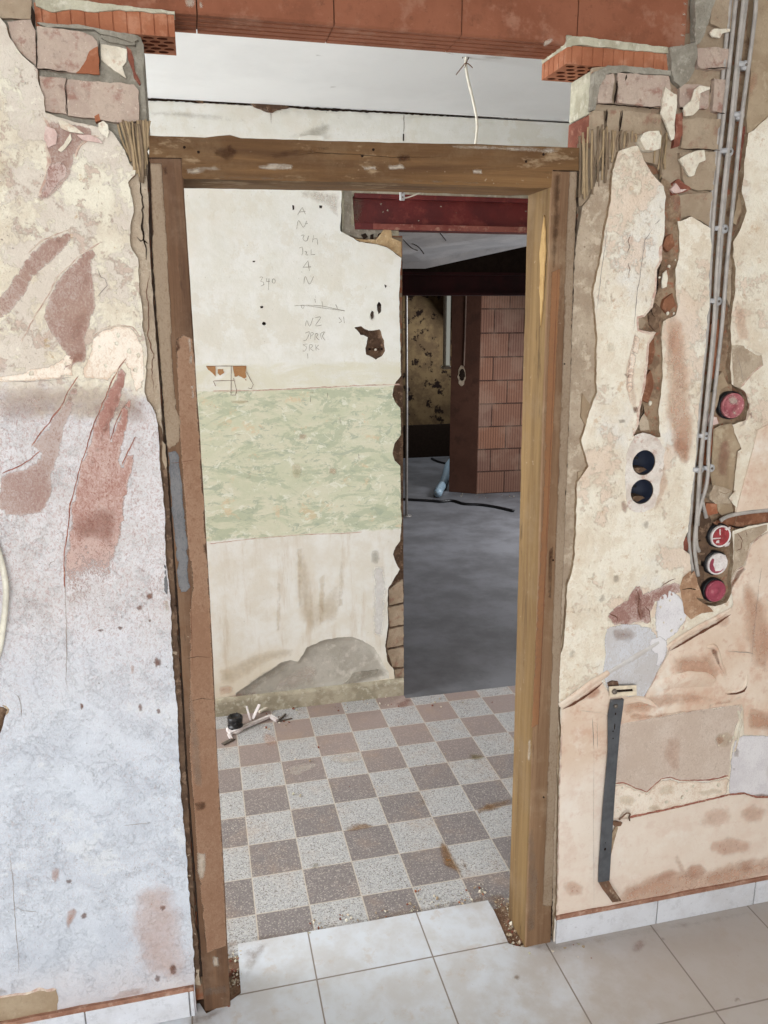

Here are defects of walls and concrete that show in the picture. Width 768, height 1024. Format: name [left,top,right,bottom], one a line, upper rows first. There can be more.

peeling [0,0,253,986]
spalling [236,283,404,696]
flaking render [532,0,768,728]
spalling [551,721,563,938]
peeling [613,706,768,819]